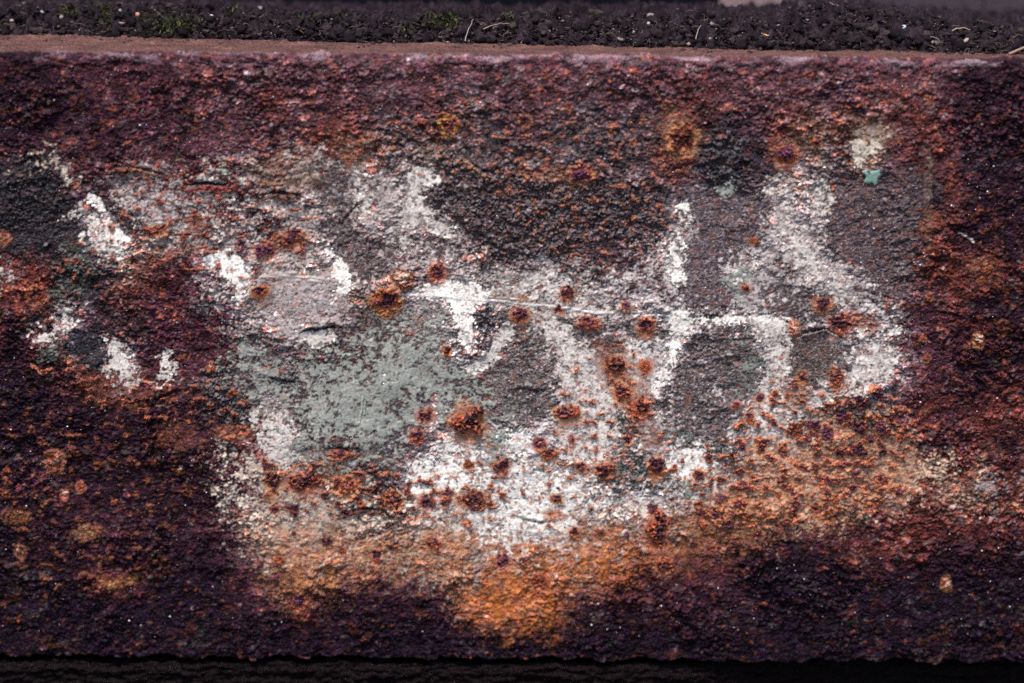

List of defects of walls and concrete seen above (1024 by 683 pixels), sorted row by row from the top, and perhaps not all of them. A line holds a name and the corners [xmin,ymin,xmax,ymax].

corrosion [335,114,674,270]
corrosion [642,105,696,186]
corrosion [774,137,822,163]
corrosion [65,357,251,459]
spalling [0,119,1007,587]
corrosion [913,310,1012,414]
corrosion [0,424,192,569]
corrosion [252,317,918,634]
corrosion [40,547,66,595]
corrosion [78,524,175,590]